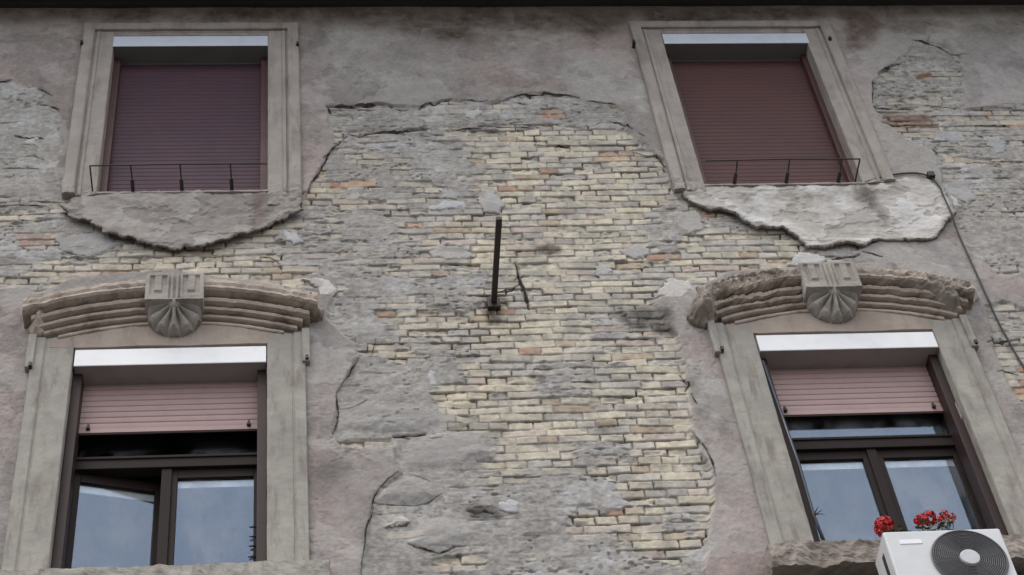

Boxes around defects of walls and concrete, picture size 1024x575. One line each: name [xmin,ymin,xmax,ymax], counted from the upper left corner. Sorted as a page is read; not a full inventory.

spalling [0,78,330,294]
crack [309,91,671,191]
crack [498,265,529,308]
spalling [301,39,1024,575]
crack [332,343,375,434]
crack [361,471,441,573]